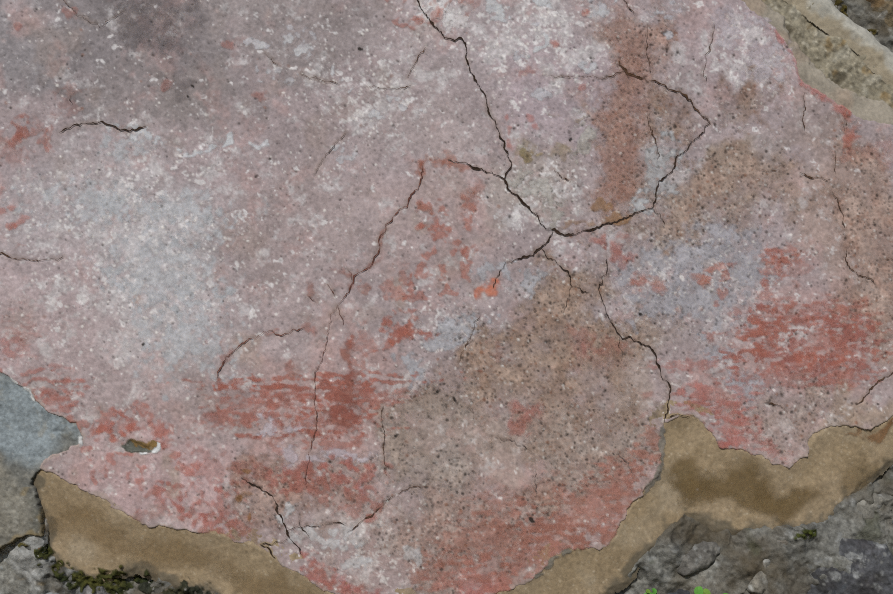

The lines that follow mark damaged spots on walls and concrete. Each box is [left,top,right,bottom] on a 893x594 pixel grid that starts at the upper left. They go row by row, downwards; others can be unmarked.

crack [59,121,146,133]
crack [372,0,711,421]
crack [800,155,845,227]
crack [217,327,305,378]
crack [305,166,423,485]
crack [856,372,893,405]
spalling [122,440,153,452]
spalling [376,272,666,594]
spalling [231,454,371,534]
crack [242,478,428,558]